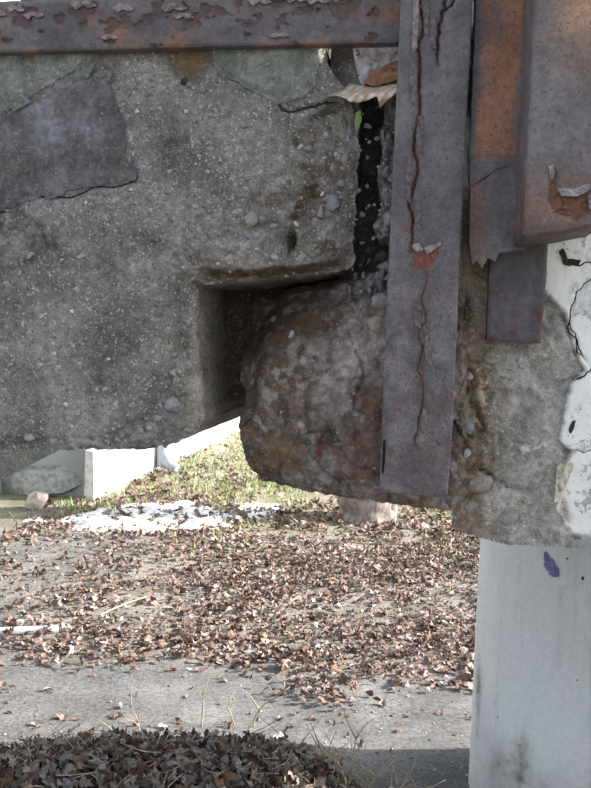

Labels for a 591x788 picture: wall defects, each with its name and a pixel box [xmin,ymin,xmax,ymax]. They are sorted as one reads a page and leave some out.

peeling [0,4,44,19]
peeling [70,0,97,9]
peeling [161,3,194,19]
crack [407,0,455,249]
rust [549,180,589,219]
peeling [558,183,591,209]
spalling [0,101,584,549]
crack [567,262,591,380]